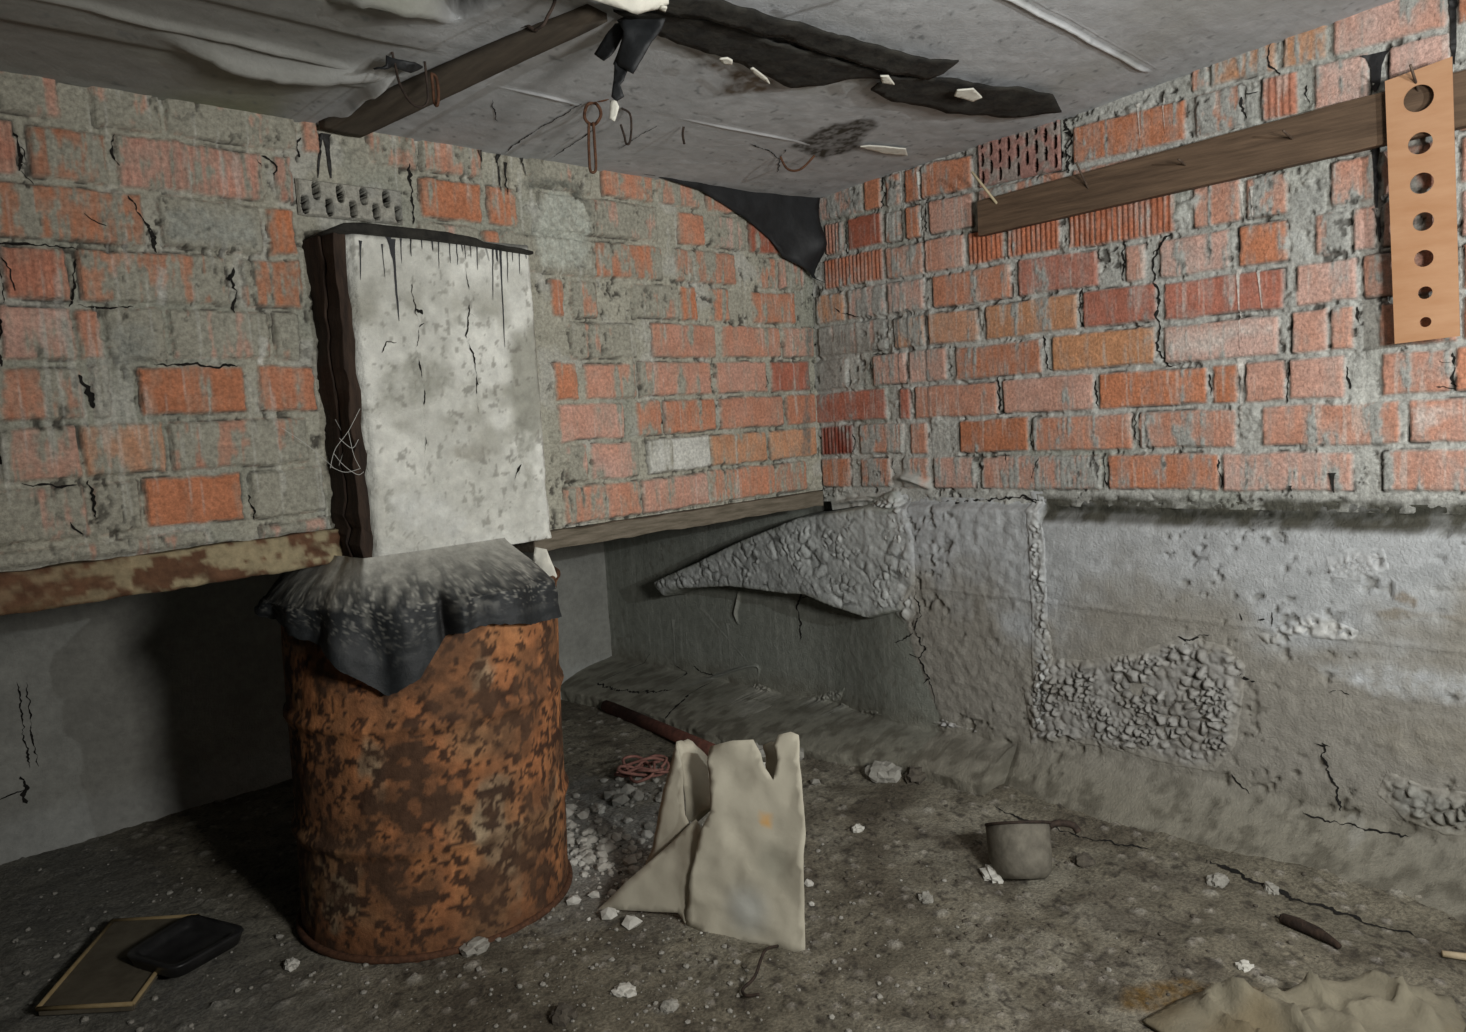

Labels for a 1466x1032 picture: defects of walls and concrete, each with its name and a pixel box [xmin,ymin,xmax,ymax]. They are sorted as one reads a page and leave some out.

flaking render [594,0,669,14]
flaking render [750,67,770,84]
flaking render [954,88,982,102]
crack [0,131,157,366]
crack [79,375,95,408]
crack [154,361,239,369]
crack [0,456,96,535]
spalling [1023,491,1245,772]
crack [0,684,39,804]
crack [1305,743,1409,838]
spalling [1377,770,1466,836]
crack [1206,859,1420,938]